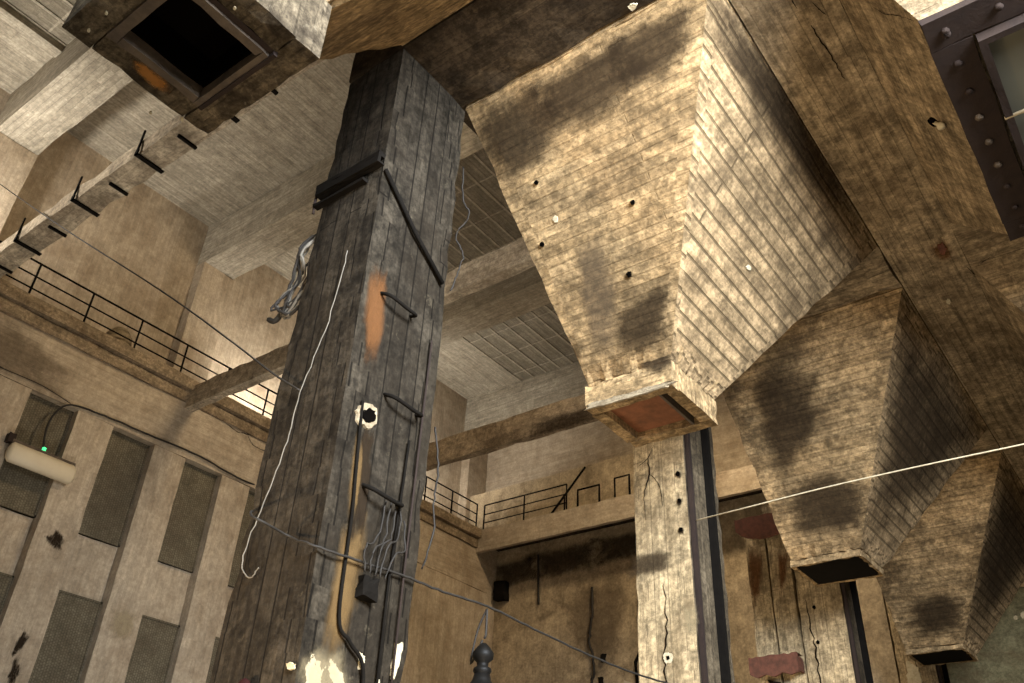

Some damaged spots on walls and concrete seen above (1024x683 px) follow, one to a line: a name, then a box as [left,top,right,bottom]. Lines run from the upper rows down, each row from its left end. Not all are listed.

corrosion [367,279,385,347]
peeling [286,654,344,683]
peeling [375,642,403,683]